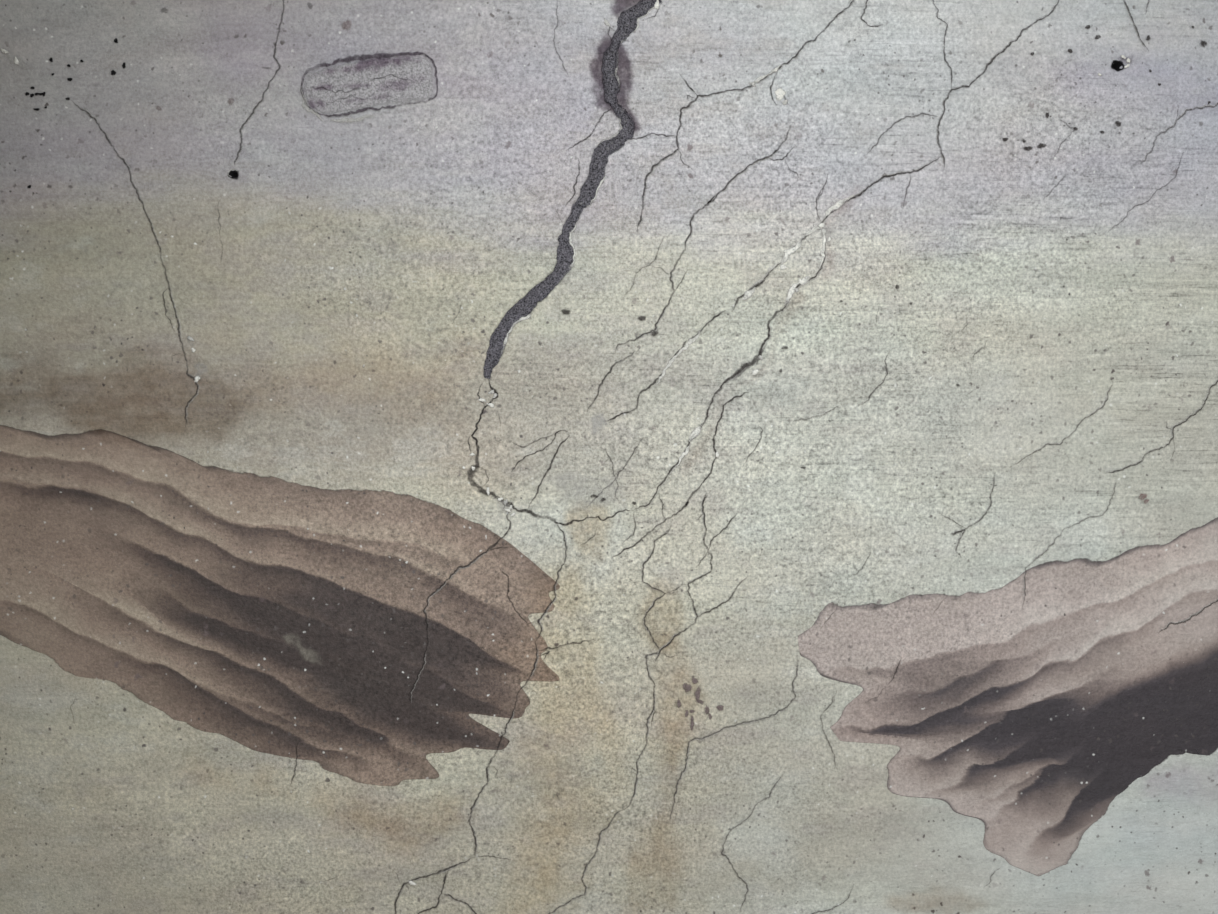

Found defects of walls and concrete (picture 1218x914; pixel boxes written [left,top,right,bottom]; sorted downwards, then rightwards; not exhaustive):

crack [234,1,284,163]
crack [1124,1,1149,46]
crack [1145,103,1218,161]
crack [76,105,200,422]
crack [394,0,1059,914]
crack [1024,381,1218,600]
crack [1161,600,1218,631]